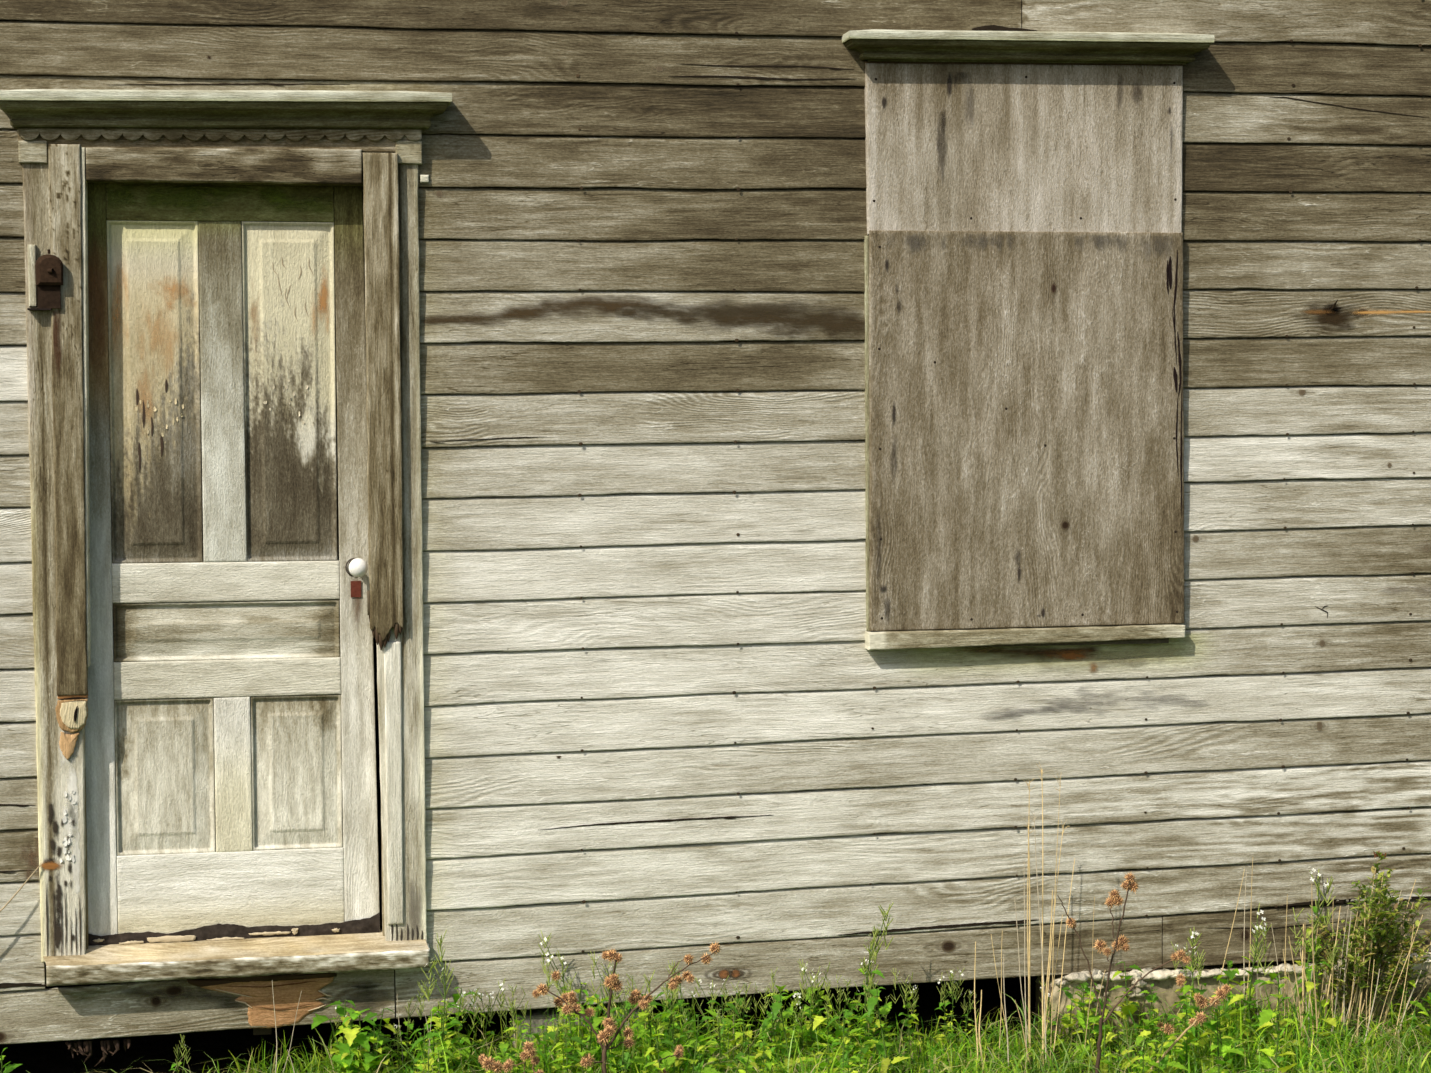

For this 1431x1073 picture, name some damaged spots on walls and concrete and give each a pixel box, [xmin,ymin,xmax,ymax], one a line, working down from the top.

water stain [424,297,865,335]
peeling [135,380,184,473]
rust [966,647,1097,671]
crack [541,815,770,830]
peeling [44,749,81,957]